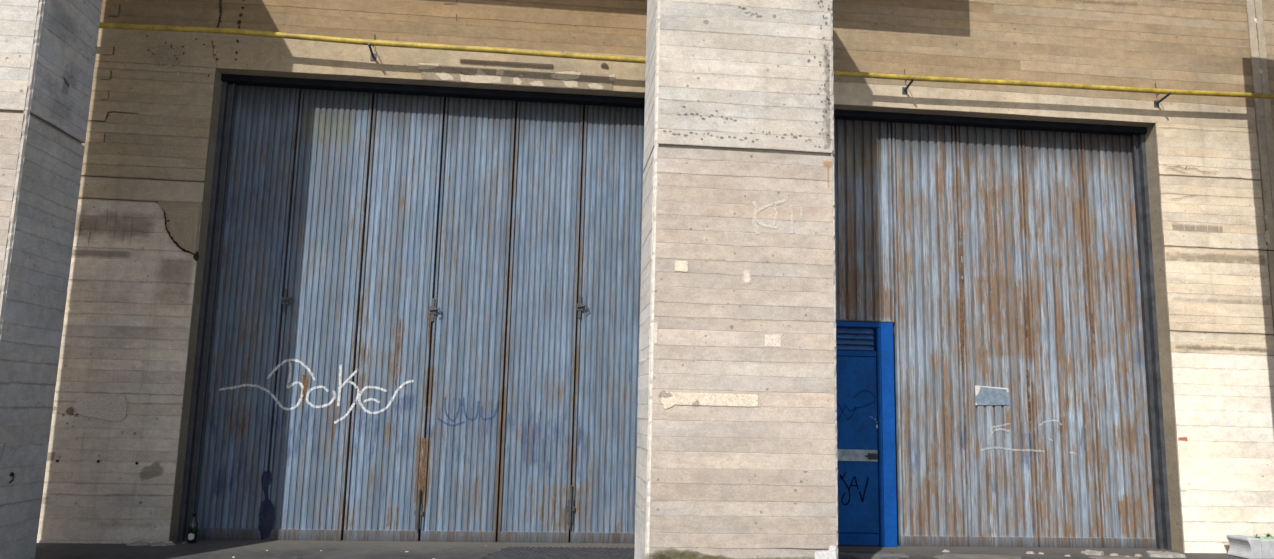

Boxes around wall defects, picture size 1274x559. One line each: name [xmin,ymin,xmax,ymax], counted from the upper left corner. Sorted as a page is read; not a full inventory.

crack [211,0,244,67]
peeling [418,63,615,90]